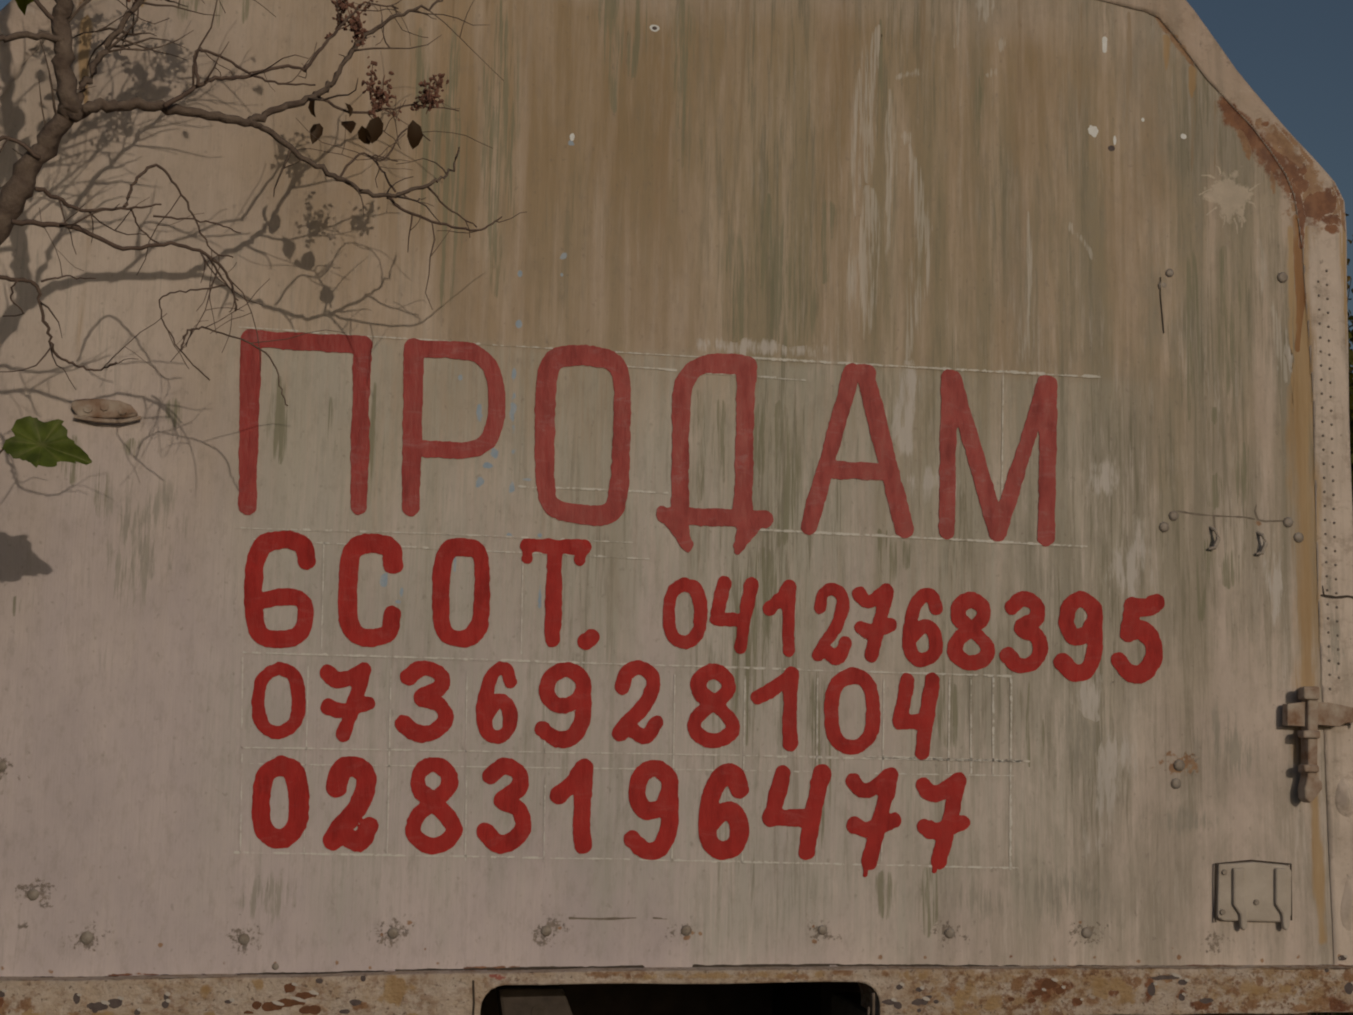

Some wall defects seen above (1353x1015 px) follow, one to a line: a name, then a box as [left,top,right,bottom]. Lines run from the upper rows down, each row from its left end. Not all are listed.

water stain [423,0,473,317]
water stain [642,0,940,509]
water stain [1020,209,1034,367]
rust [1215,92,1348,703]
water stain [955,467,971,509]
rust [569,725,1353,1015]
peeling [73,993,141,1015]
peeling [224,978,323,1015]
peeling [339,999,361,1014]
peeling [882,982,939,1012]
peeling [1008,978,1083,1005]
peeling [1148,973,1214,1004]